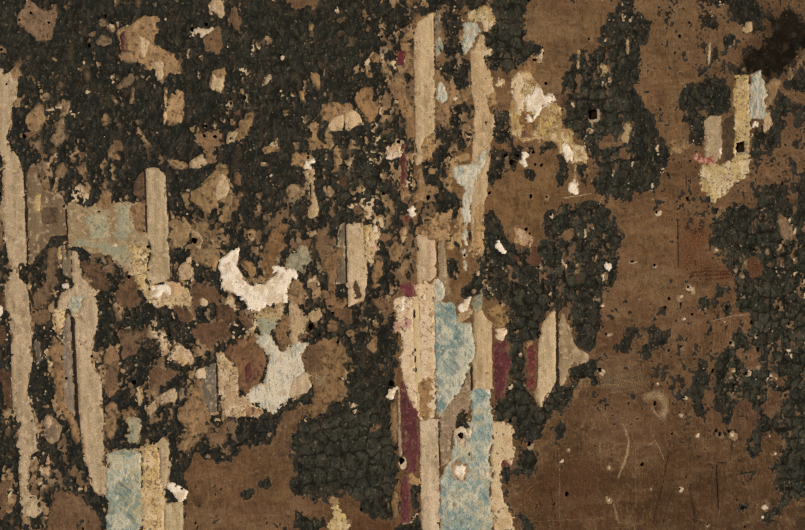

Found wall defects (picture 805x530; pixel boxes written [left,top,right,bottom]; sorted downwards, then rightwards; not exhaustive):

peeling [88,0,189,81]
peeling [24,92,70,153]
peeling [163,89,185,126]
peeling [167,101,256,170]
peeling [352,9,494,280]
peeling [485,66,542,144]
peeling [520,141,590,186]
peeling [680,104,705,146]
peeling [0,169,281,530]
peeling [495,328,516,341]
peeling [570,359,601,385]
peeling [500,442,537,483]